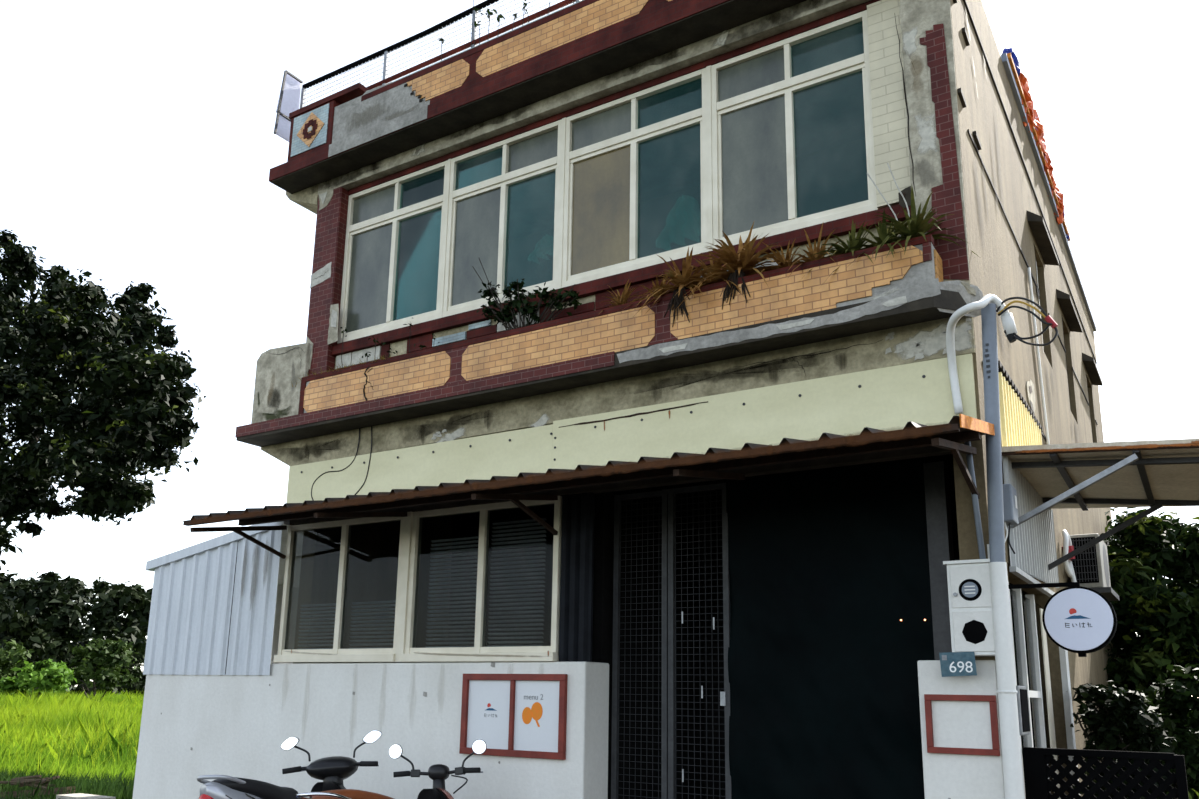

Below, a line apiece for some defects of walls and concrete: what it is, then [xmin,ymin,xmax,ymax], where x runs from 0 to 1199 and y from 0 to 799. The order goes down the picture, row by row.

peeling [332,82,426,143]
peeling [895,4,941,218]
spalling [617,266,983,363]